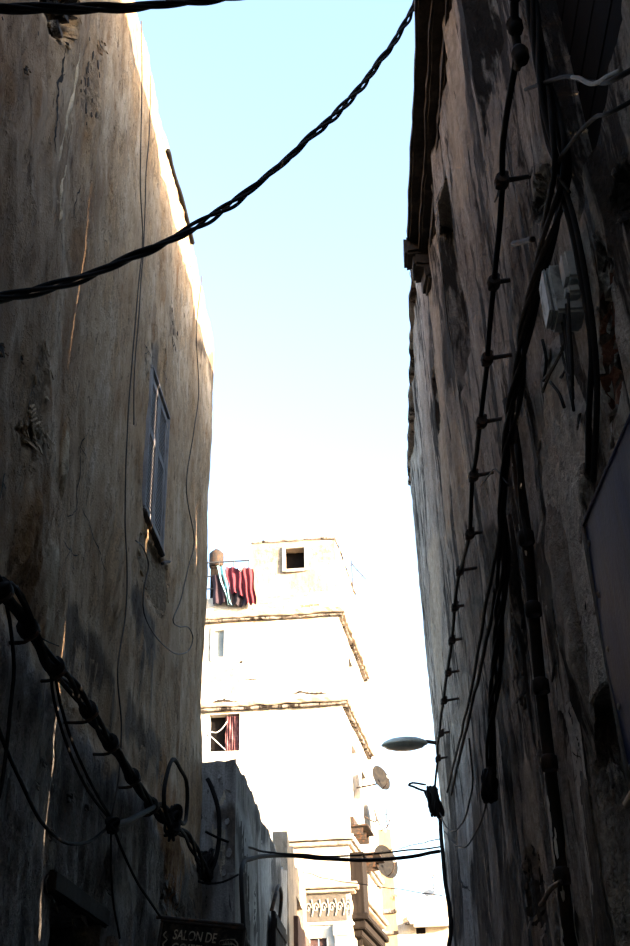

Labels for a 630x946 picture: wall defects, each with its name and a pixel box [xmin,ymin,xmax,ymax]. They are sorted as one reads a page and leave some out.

crack [54,47,72,155]
leakage [442,0,528,448]
peeling [0,336,54,455]